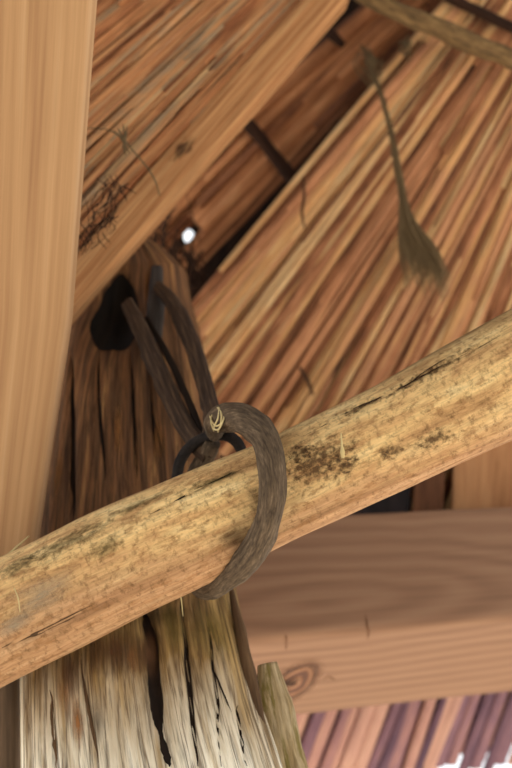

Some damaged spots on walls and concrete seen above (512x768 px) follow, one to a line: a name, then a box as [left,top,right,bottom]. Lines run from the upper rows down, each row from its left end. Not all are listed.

crack [353,360,446,409]
mould [286,435,358,488]
crack [2,608,85,648]
crack [142,614,171,767]
crack [180,599,198,766]
crack [205,608,247,767]